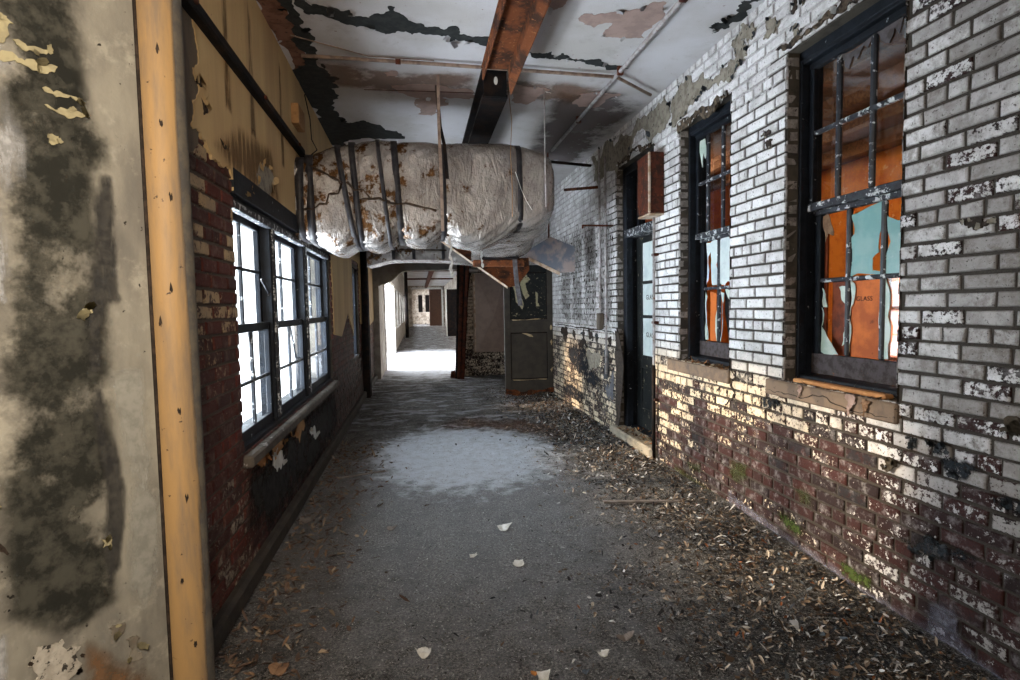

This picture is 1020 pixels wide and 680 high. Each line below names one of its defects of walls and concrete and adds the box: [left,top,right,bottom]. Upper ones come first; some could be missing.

peeling [548,0,567,15]
peeling [385,70,474,116]
spalling [572,0,859,184]
damp [0,0,157,630]
peeling [762,397,780,410]
peeling [844,394,856,417]
peeling [905,436,977,480]
peeling [993,496,1020,514]
peeling [902,534,974,566]
spalling [28,639,86,680]